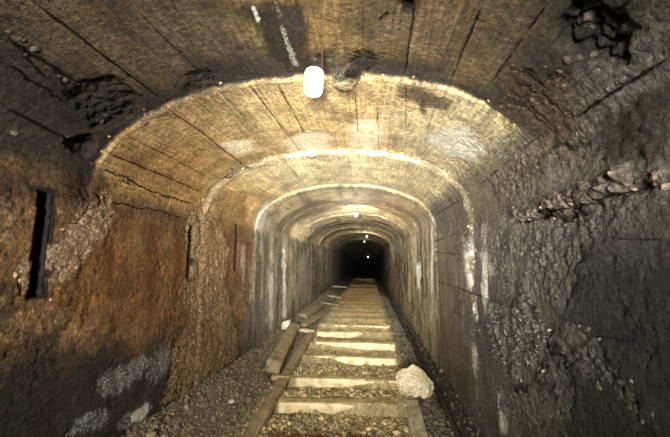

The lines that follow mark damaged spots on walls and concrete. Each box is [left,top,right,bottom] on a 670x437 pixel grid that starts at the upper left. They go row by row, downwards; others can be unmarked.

spalling [559,0,637,66]
spalling [67,70,238,128]
spalling [328,51,385,86]
crack [573,52,670,117]
crack [99,154,201,218]
peeling [45,162,114,289]
spalling [486,162,670,312]
leakage [102,345,171,397]
leakage [72,409,109,436]
leakage [118,402,152,430]